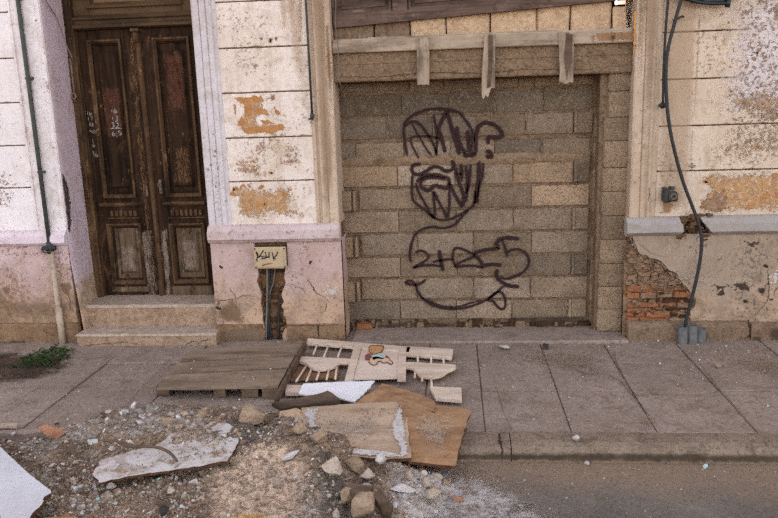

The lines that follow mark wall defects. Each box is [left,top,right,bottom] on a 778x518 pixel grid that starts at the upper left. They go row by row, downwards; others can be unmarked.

peeling [234,94,286,134]
peeling [676,0,778,241]
peeling [207,150,306,219]
spalling [258,268,287,340]
crack [286,271,341,339]
spalling [621,236,694,337]
spalling [712,264,778,303]